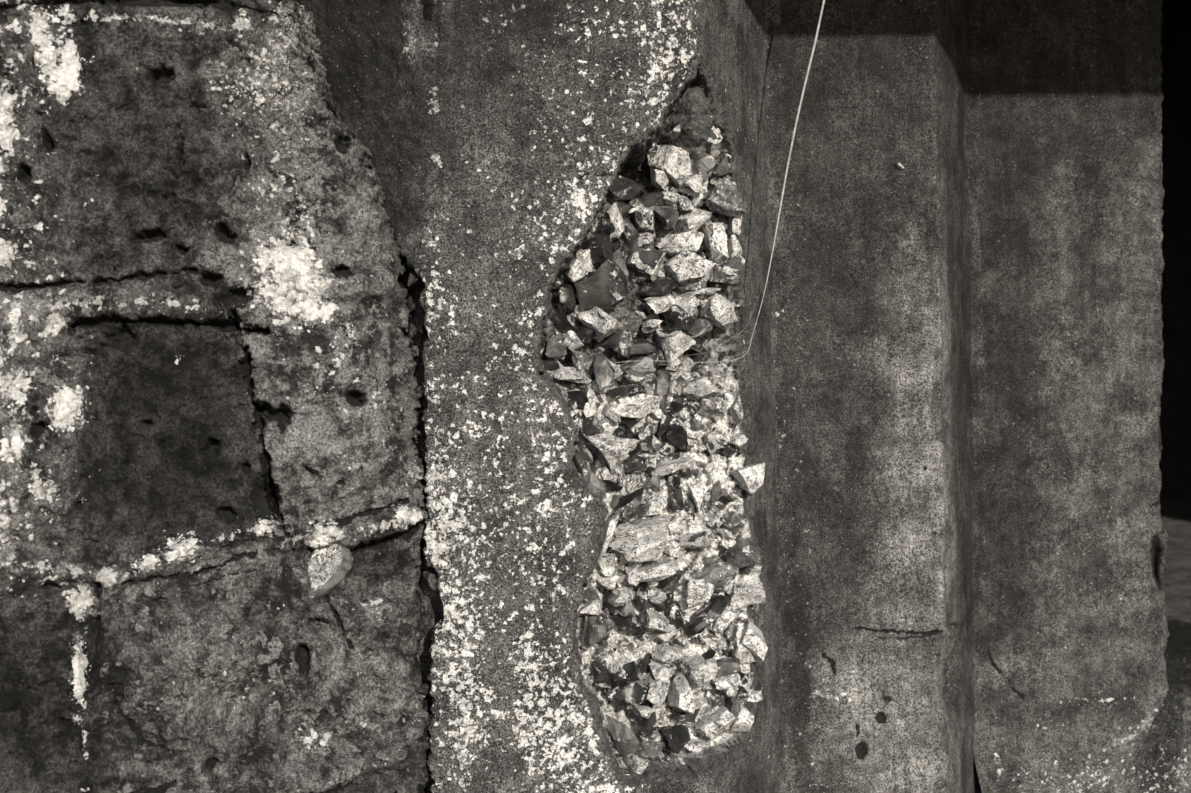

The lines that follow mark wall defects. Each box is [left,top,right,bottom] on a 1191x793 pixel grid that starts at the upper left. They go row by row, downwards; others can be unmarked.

spalling [534,59,768,788]
crack [855,627,943,656]